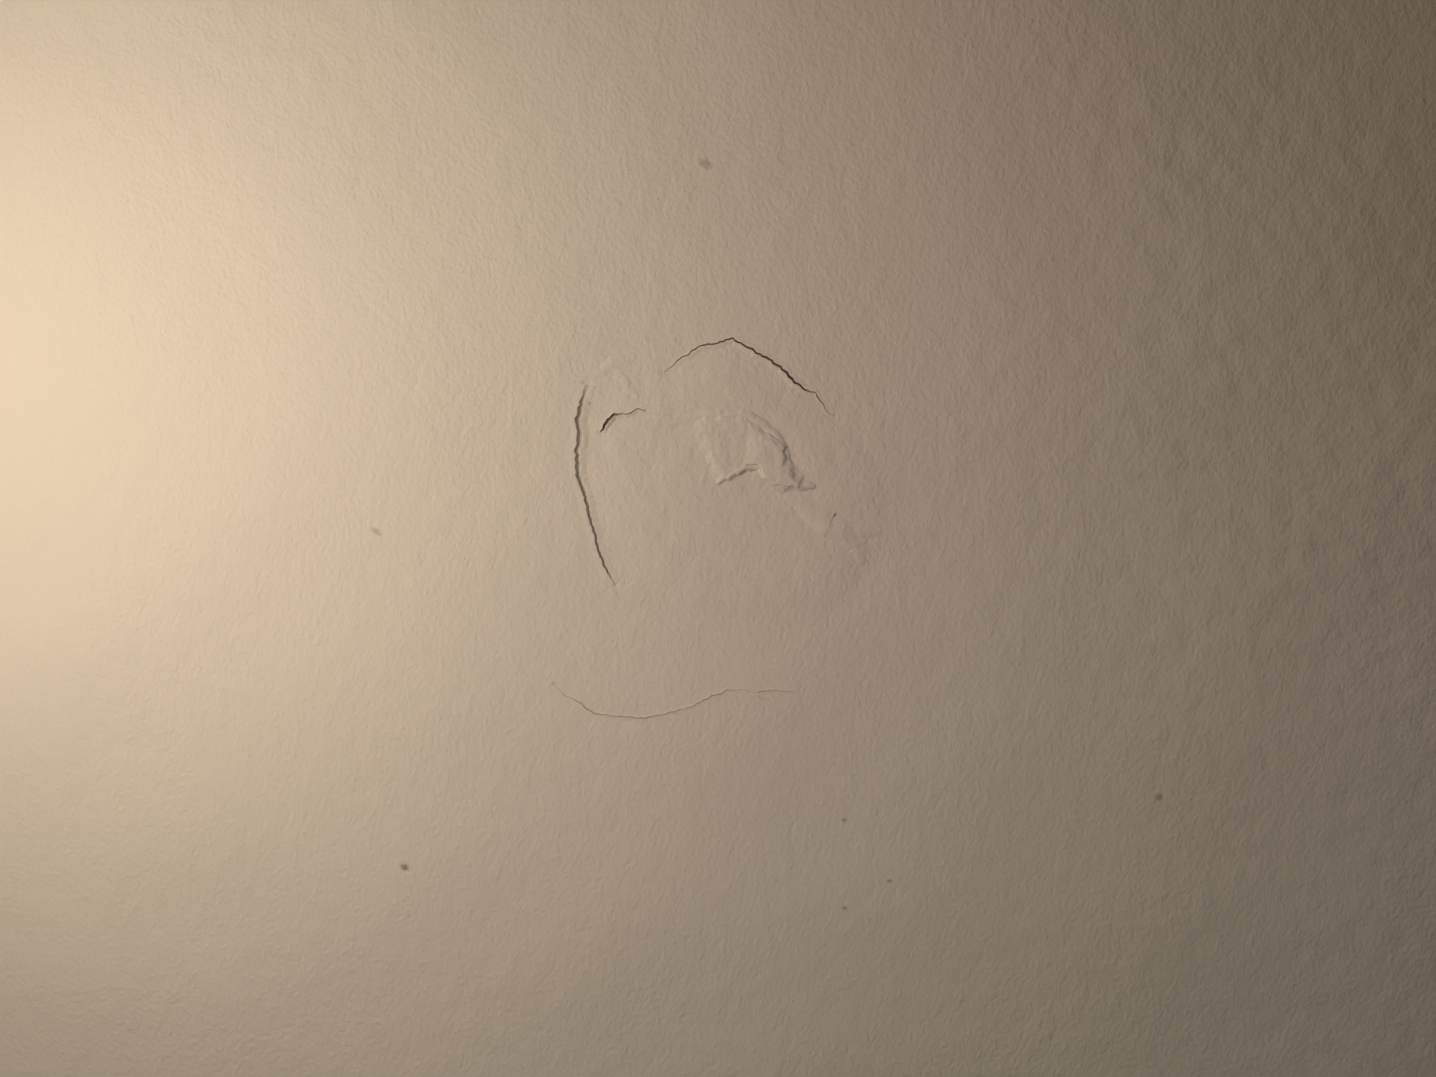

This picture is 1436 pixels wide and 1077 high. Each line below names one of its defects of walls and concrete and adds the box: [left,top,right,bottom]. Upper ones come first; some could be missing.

crack [661,332,835,418]
crack [567,383,646,587]
crack [553,683,794,722]